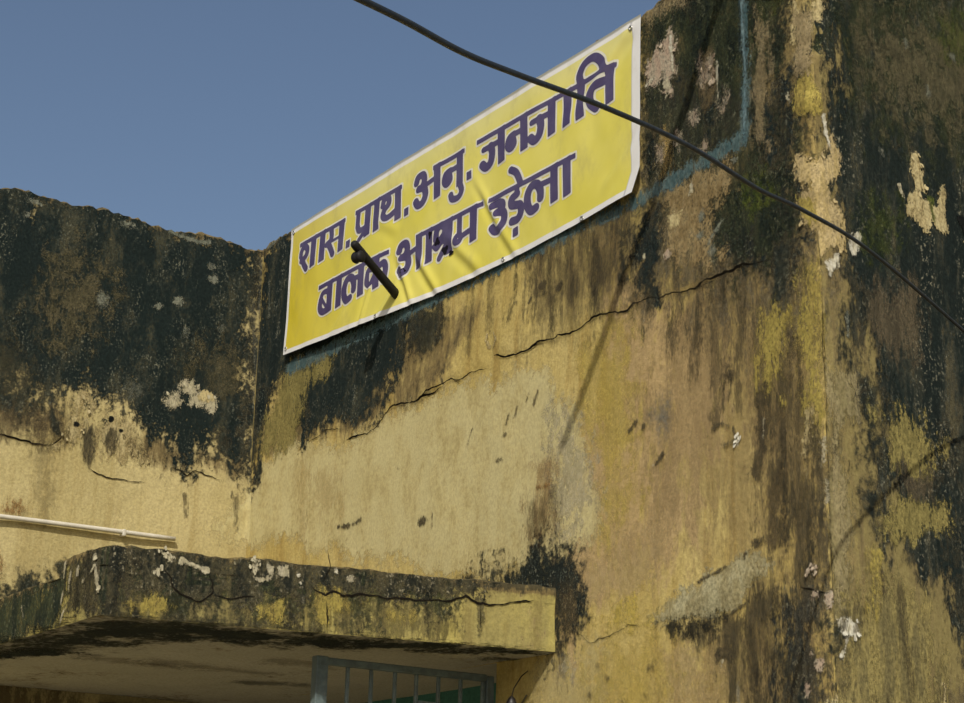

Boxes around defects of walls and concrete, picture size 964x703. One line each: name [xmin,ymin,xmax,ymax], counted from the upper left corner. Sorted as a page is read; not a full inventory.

peeling [644,25,679,98]
peeling [897,151,964,235]
peeling [161,379,220,415]
leakage [0,188,449,530]
crack [305,261,763,445]
leakage [618,0,964,703]
crack [2,434,64,445]
peeling [153,546,210,577]
crack [165,570,253,608]
leakage [0,523,591,680]